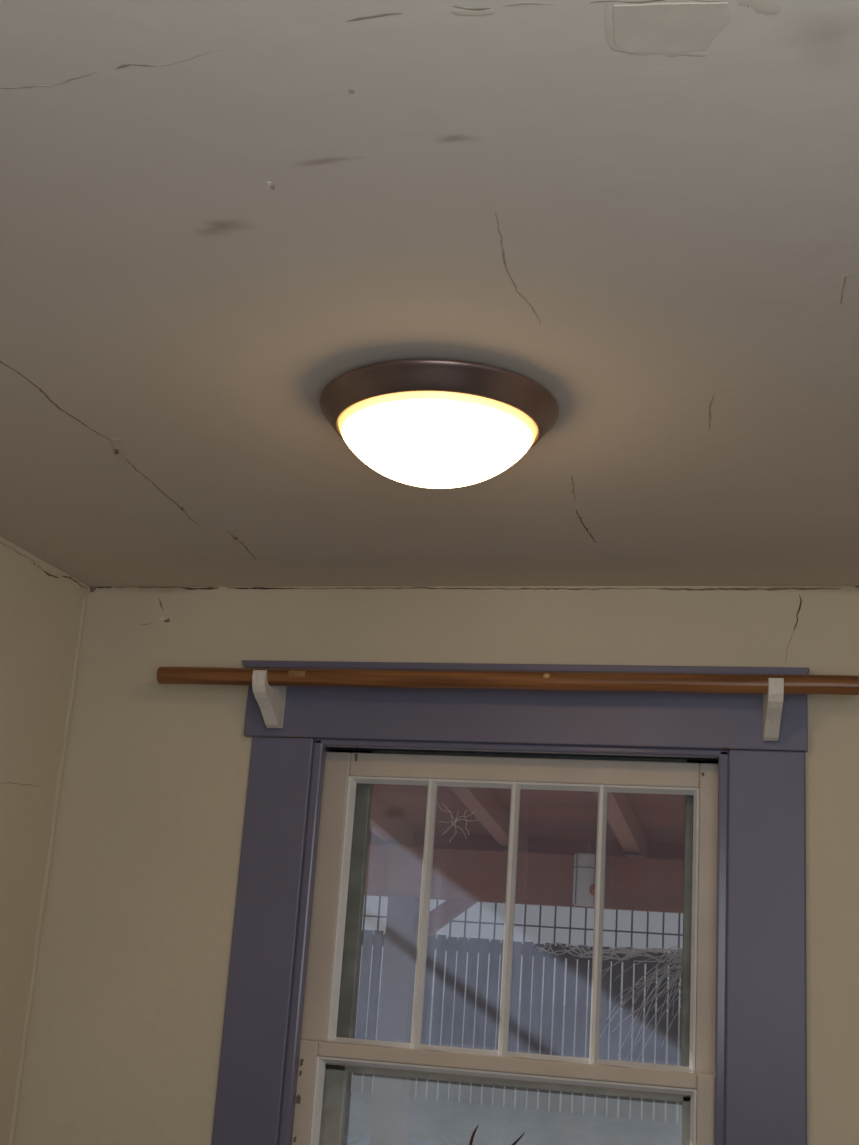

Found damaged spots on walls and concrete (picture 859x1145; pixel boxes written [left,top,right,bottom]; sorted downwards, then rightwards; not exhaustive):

crack [346,13,402,22]
crack [451,2,553,17]
crack [590,0,663,8]
crack [0,49,222,89]
crack [495,212,541,325]
crack [0,361,859,662]